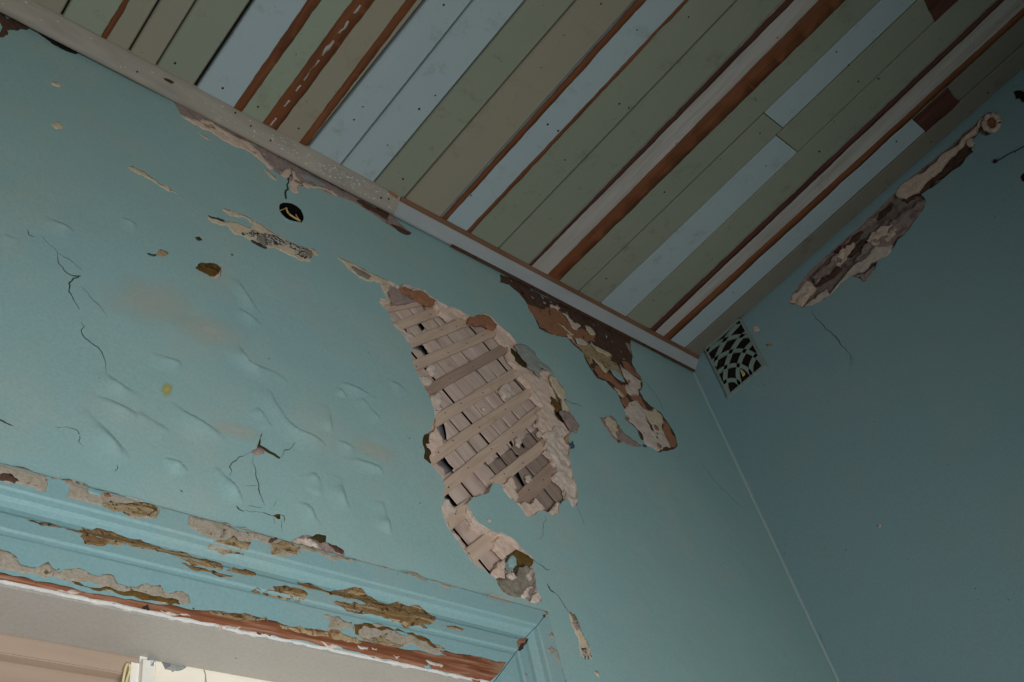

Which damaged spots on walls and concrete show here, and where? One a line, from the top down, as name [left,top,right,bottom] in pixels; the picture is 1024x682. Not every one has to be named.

peeling [181,115,339,196]
crack [27,230,107,372]
spalling [196,266,219,277]
peeling [207,208,319,262]
spalling [279,205,302,222]
flaking render [789,112,1002,308]
peeling [500,274,678,452]
peeling [0,463,167,519]
crack [229,434,295,528]
flaking render [338,258,580,618]
peeling [0,515,464,667]
peeling [568,612,600,678]